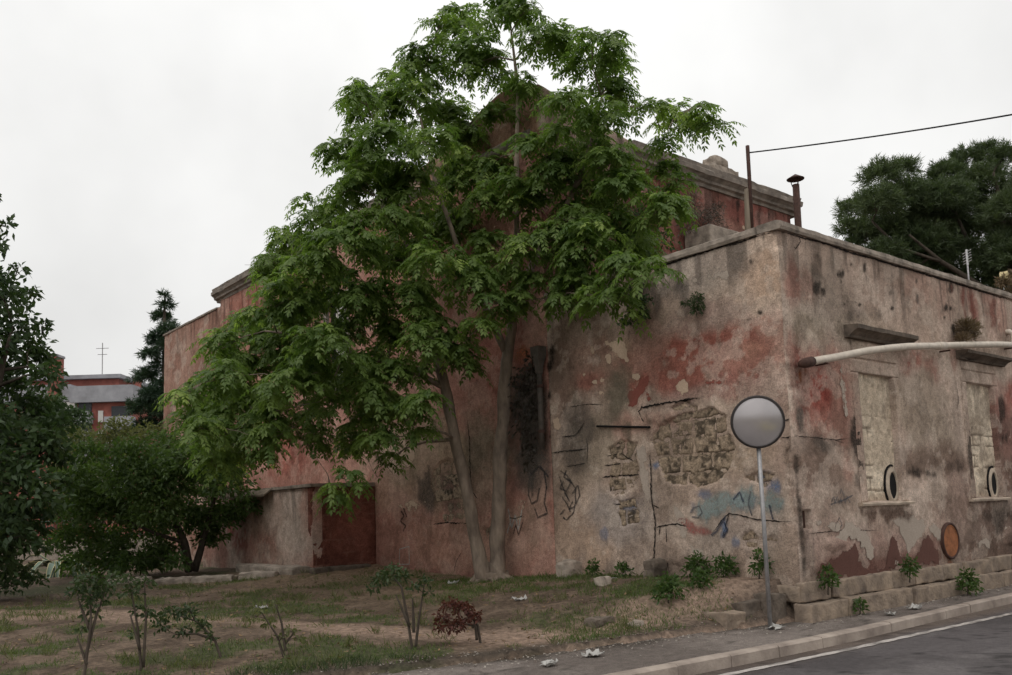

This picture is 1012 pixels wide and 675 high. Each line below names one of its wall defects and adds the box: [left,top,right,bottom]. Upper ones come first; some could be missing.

spalling [609,379,736,526]
spalling [745,471,775,487]
peeling [817,511,941,579]